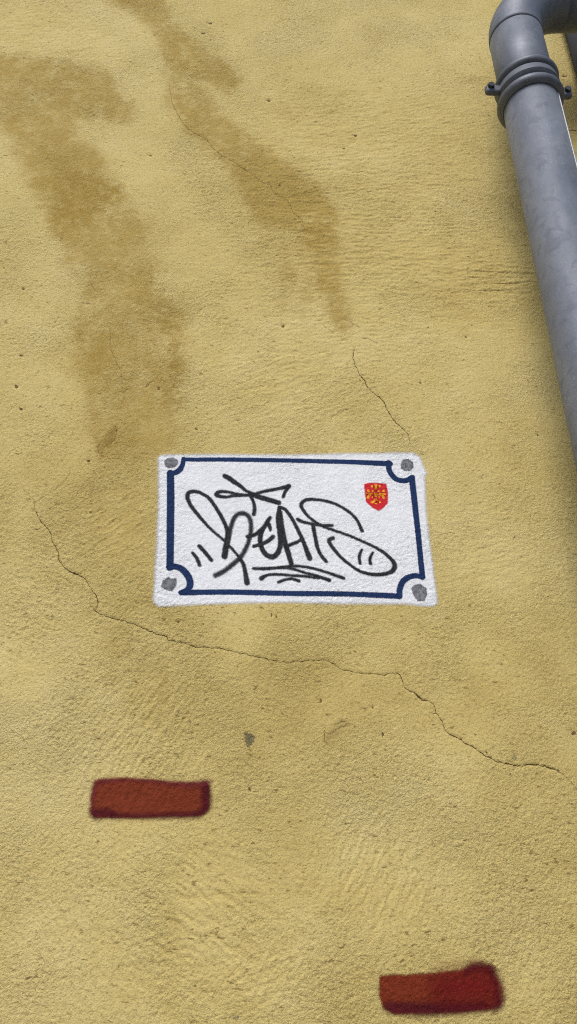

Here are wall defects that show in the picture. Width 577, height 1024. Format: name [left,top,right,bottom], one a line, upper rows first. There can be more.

crack [324,319,410,440]
crack [32,467,577,790]